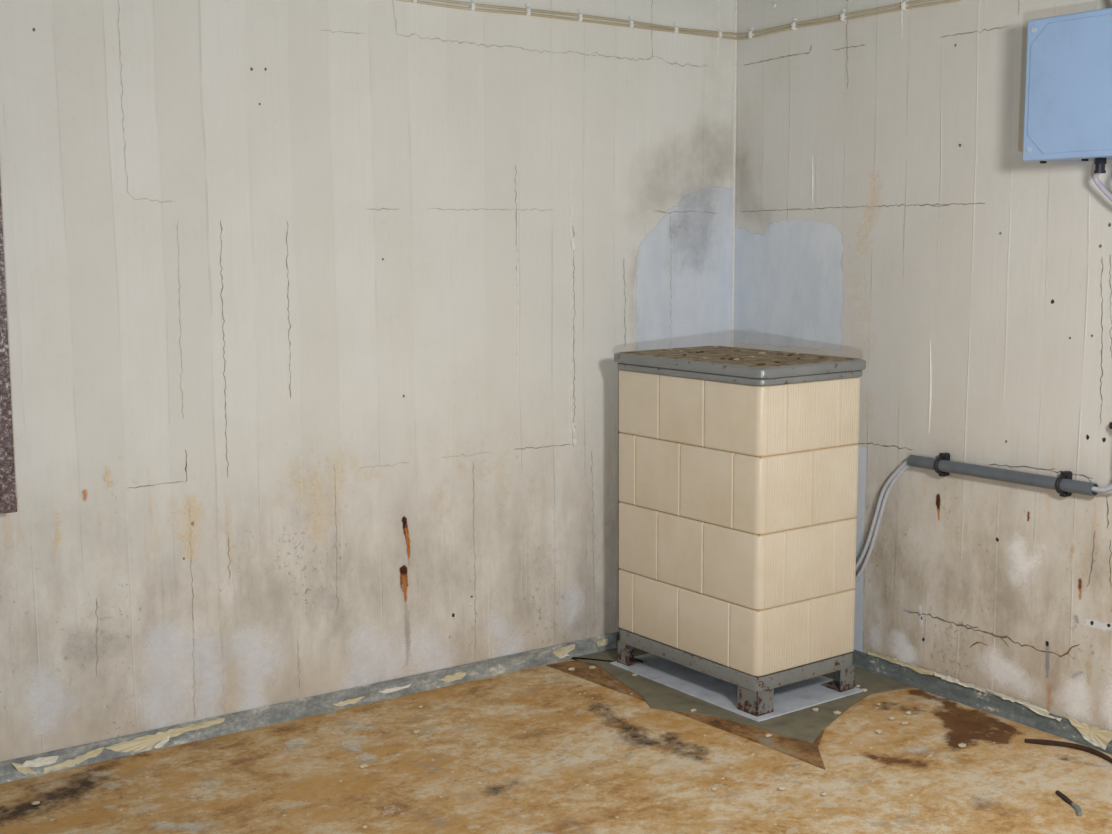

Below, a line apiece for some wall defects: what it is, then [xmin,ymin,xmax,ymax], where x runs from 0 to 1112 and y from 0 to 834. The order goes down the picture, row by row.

crack [392,0,708,67]
corrosion [400,517,410,602]
crack [907,611,1080,657]
peeling [868,651,1112,750]
efflorescence [990,654,1029,691]
efflorescence [1066,681,1088,715]
peeling [11,718,225,778]